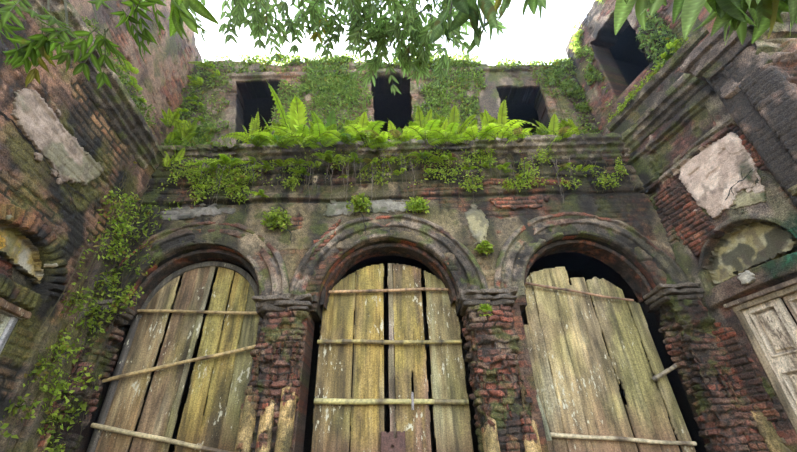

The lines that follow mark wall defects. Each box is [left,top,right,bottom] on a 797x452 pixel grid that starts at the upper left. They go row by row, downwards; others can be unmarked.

flaking render [10,88,105,186]
flaking render [0,215,58,284]
flaking render [653,126,797,288]
spalling [712,322,781,421]